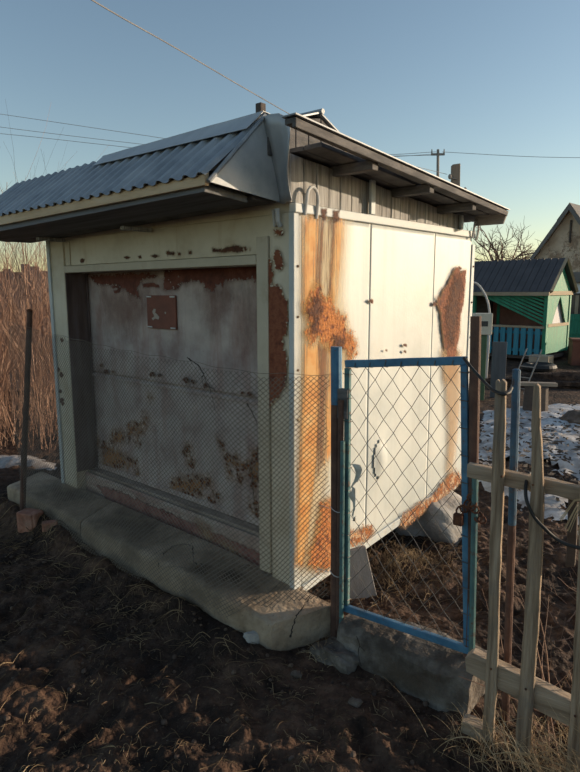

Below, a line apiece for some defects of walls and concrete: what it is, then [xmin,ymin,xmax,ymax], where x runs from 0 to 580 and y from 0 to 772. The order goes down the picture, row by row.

peeling [88,266,257,298]
corrosion [304,280,359,360]
corrosion [433,266,466,357]
corrosion [217,440,259,488]
corrosion [399,468,461,528]
corrosion [307,498,331,575]
corrosion [350,523,374,547]
crack [289,591,316,637]